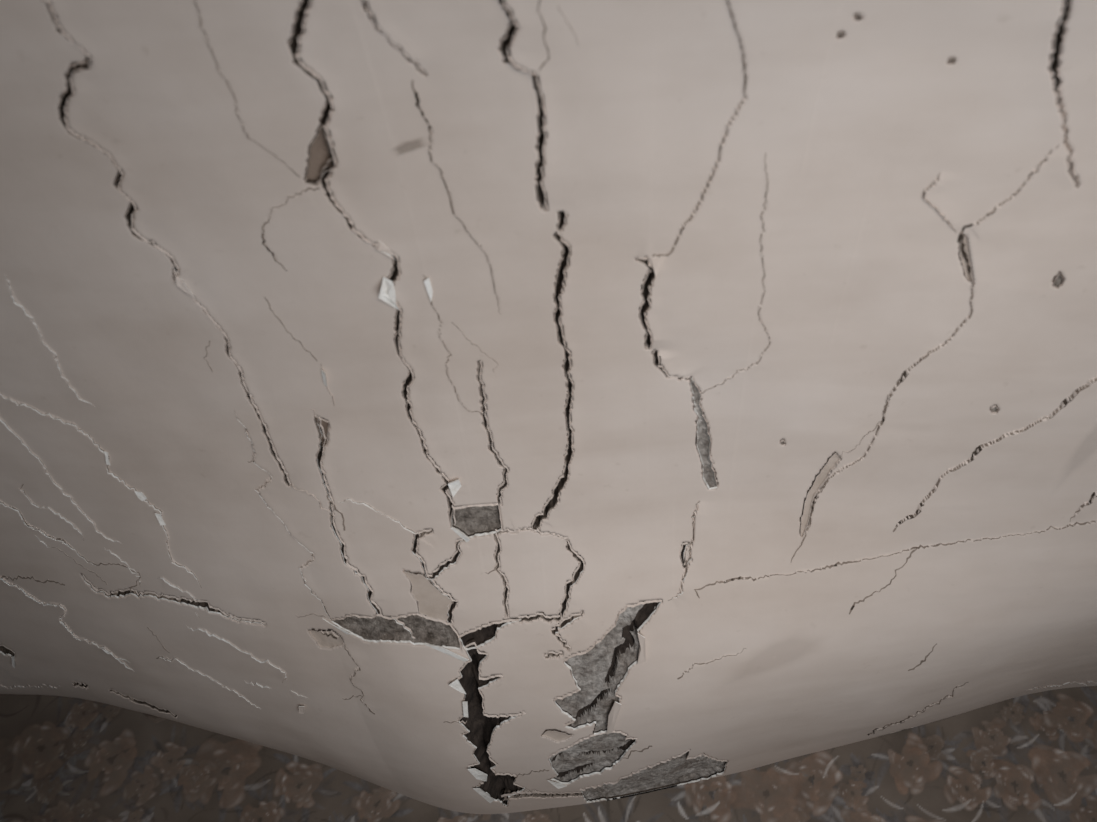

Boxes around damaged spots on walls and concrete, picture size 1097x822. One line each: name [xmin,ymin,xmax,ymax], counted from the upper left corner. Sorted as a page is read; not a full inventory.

peeling [305,122,335,184]
crack [636,0,771,394]
crack [44,0,585,658]
crack [668,0,1097,614]
flaking render [690,378,718,490]
crack [0,273,309,714]
flaking render [450,503,502,542]
crack [343,644,376,715]
flaking render [308,571,728,807]
crack [867,682,969,736]
crack [908,643,937,671]
crack [501,788,582,801]